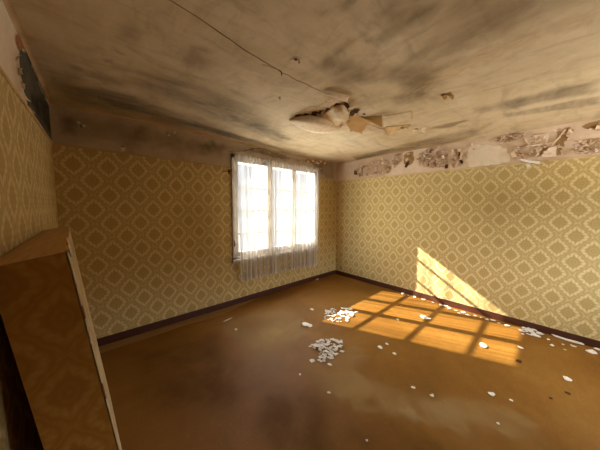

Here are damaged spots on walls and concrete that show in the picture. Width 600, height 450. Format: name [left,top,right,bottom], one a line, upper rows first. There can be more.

spalling [16,34,52,140]
crack [170,0,320,91]
peeling [289,91,426,136]
spalling [354,120,600,177]